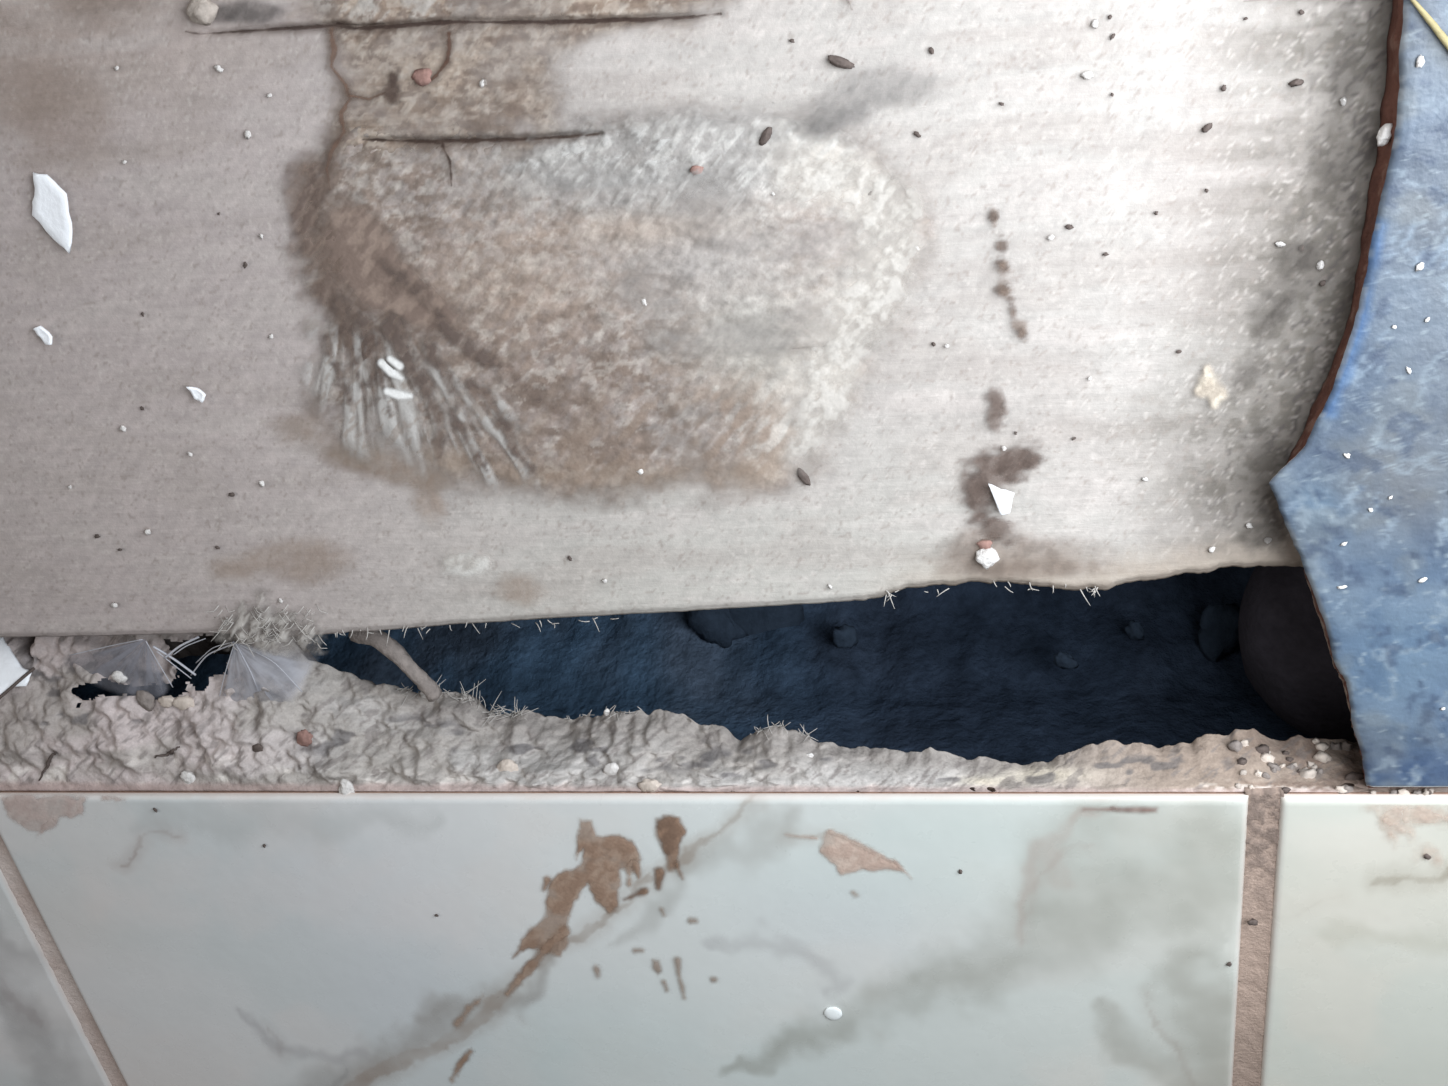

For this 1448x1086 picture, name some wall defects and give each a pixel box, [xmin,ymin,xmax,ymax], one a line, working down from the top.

crack [185,13,722,190]